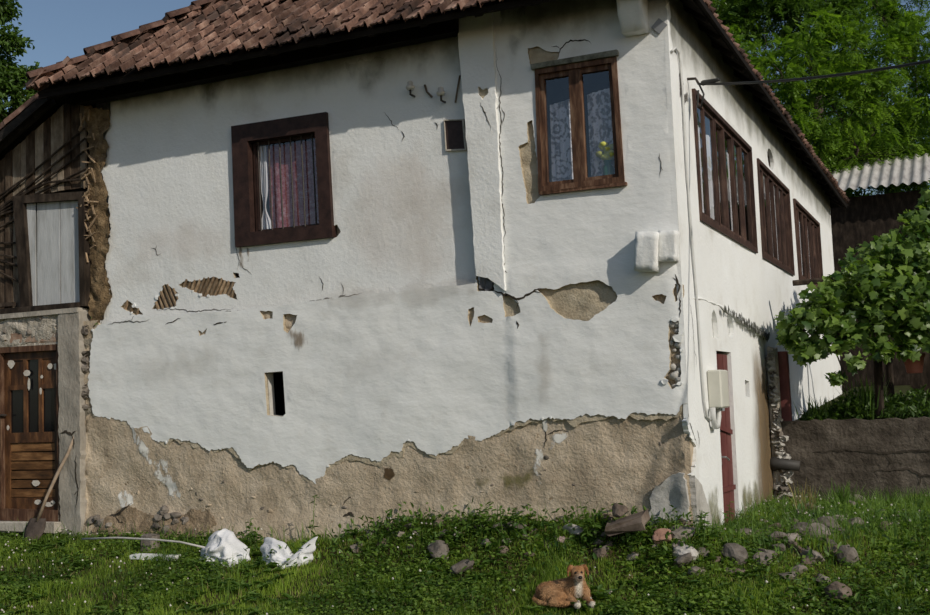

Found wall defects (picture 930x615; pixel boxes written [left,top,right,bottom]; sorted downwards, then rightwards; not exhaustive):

crack [553,39,591,56]
peeling [520,122,540,204]
crack [479,60,544,329]
peeling [285,314,297,332]
peeling [469,308,493,324]
peeling [503,296,520,317]
peeling [539,281,617,321]
flaking render [82,317,696,542]